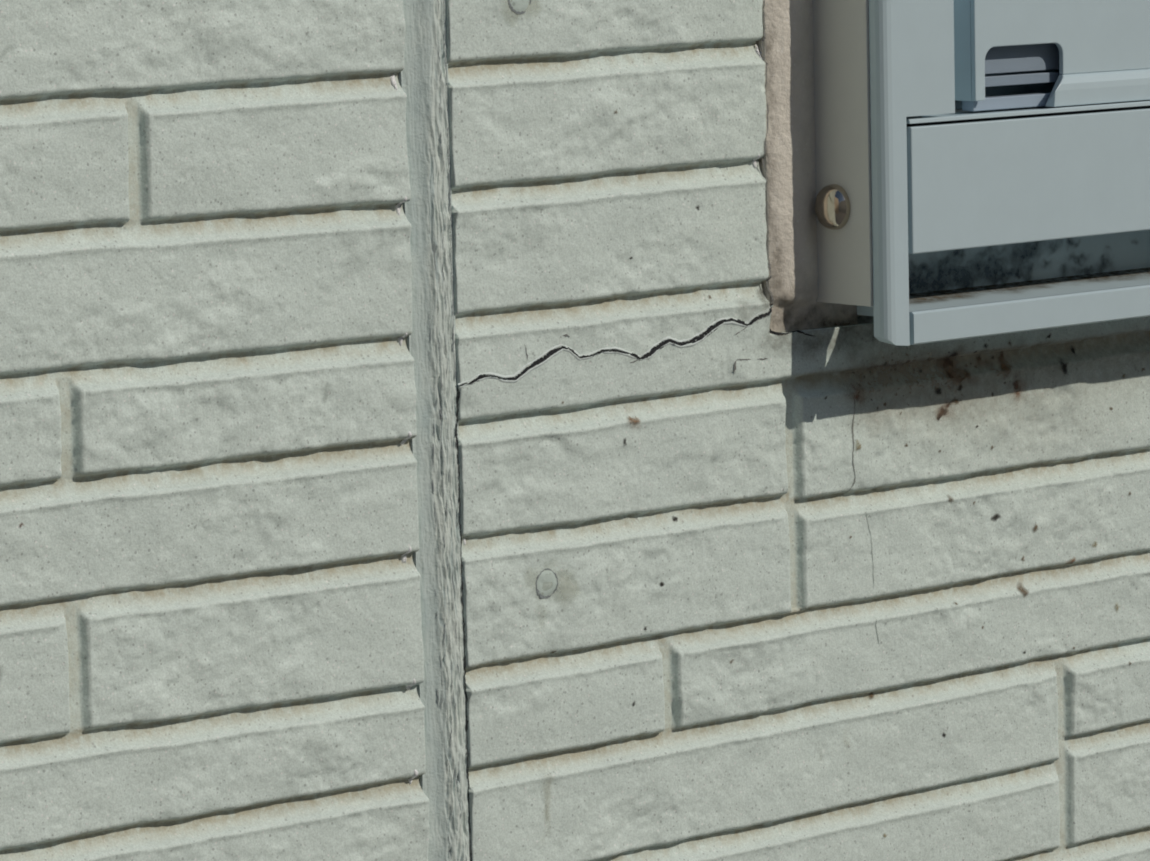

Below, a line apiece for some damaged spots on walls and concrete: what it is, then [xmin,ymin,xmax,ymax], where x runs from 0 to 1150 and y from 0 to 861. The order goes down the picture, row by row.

crack [428,0,816,861]